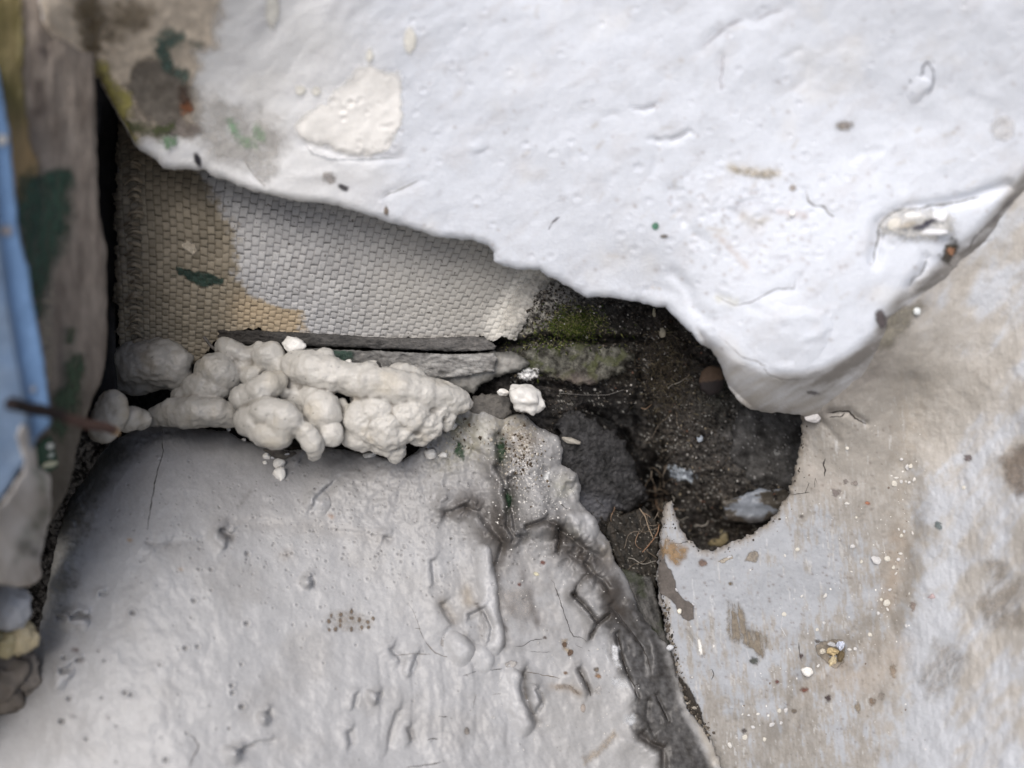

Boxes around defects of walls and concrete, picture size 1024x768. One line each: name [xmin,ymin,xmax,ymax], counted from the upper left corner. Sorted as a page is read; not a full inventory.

flaking render [295,65,402,156]
spalling [323,173,348,191]
crack [147,430,164,529]
spalling [263,449,296,459]
crack [401,605,499,707]
crack [516,639,591,696]
crack [615,613,668,721]